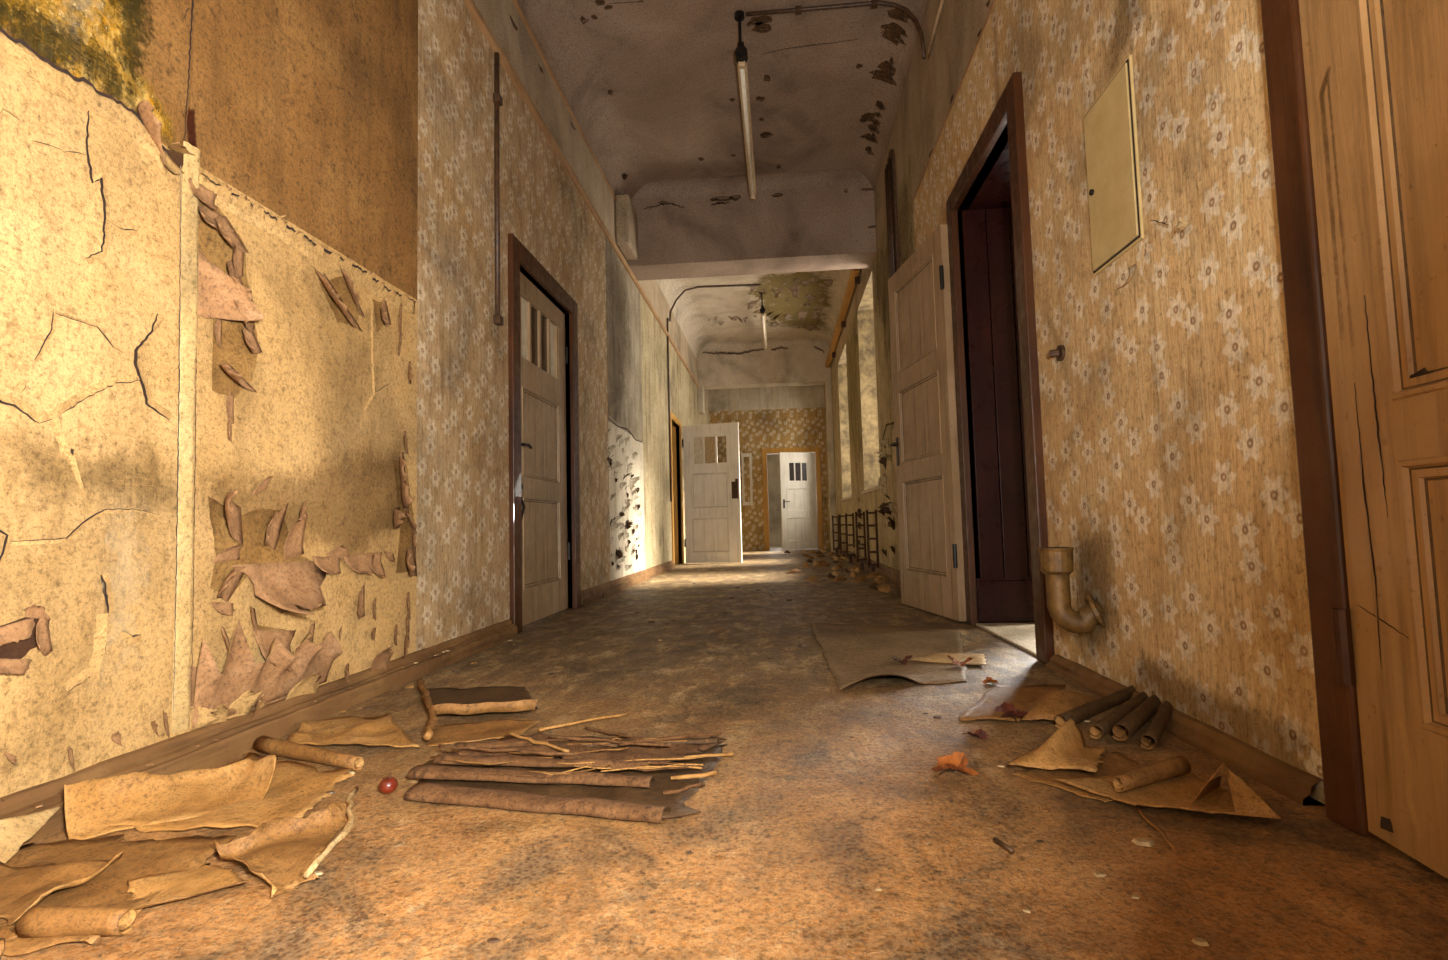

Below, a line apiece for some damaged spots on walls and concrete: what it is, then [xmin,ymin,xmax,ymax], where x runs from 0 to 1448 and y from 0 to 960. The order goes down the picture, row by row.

crack [0,107,139,264]
leakage [0,0,172,144]
peeling [746,15,773,33]
peeling [859,100,886,156]
peeling [856,8,910,86]
peeling [708,278,833,332]
crack [0,309,173,570]
peeling [606,429,642,571]
peeling [0,604,53,675]
crack [63,572,141,692]
peeling [189,431,418,731]
peeling [151,710,170,739]